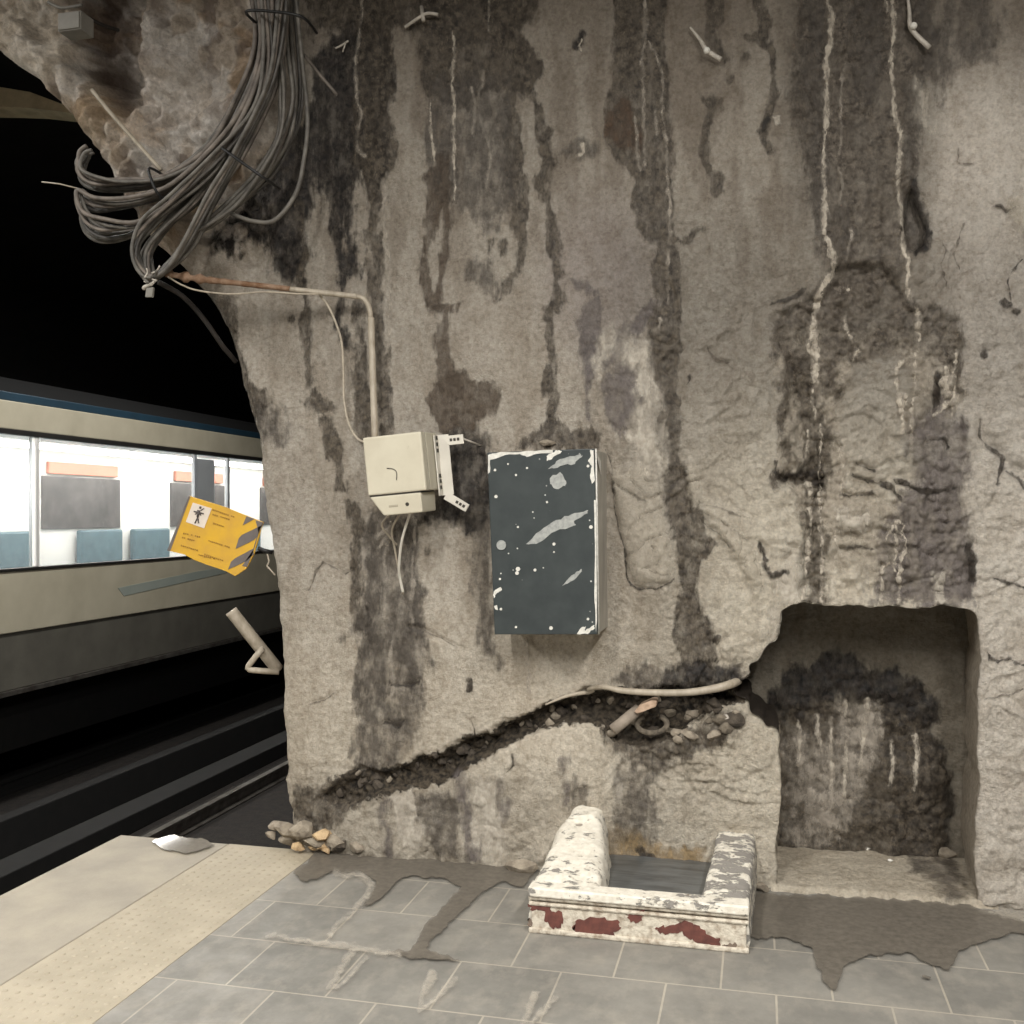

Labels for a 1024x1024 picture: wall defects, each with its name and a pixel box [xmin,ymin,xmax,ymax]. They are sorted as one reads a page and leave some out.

water stain [209,0,742,774]
water stain [769,0,998,639]
crack [384,720,405,728]
crack [391,679,420,687]
water stain [293,770,535,961]
water stain [751,651,1024,990]